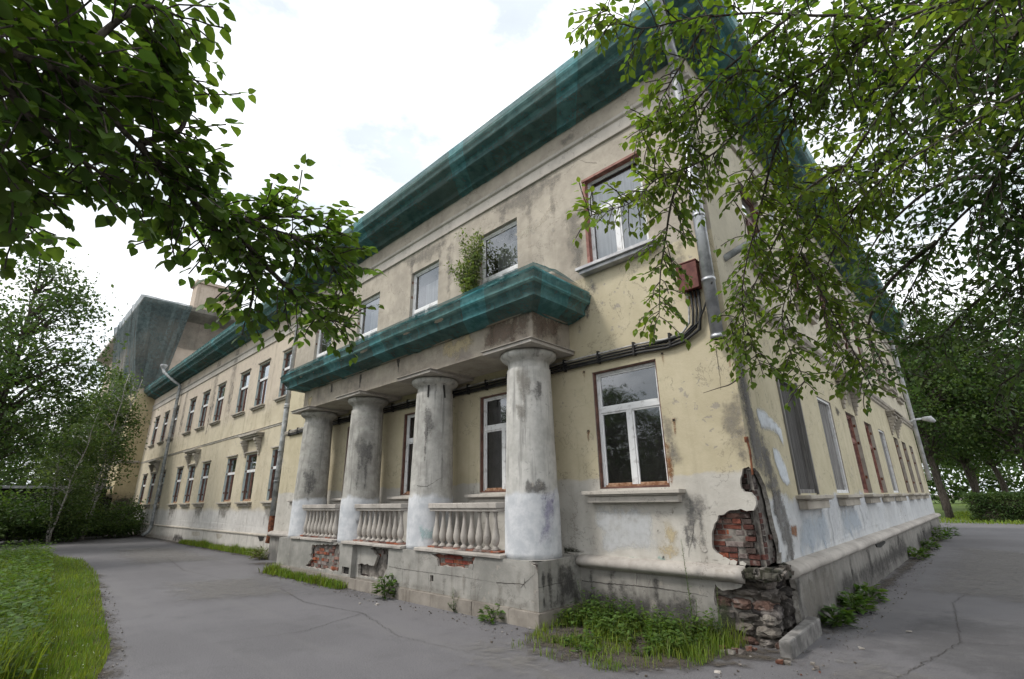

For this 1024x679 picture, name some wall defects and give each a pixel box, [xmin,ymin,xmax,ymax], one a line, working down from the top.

water stain [355,442,372,486]
water stain [726,347,827,560]
water stain [685,500,703,546]
spalling [308,544,340,571]
spalling [361,547,389,578]
spalling [435,553,475,570]
spalling [713,467,797,649]
water stain [542,558,695,625]